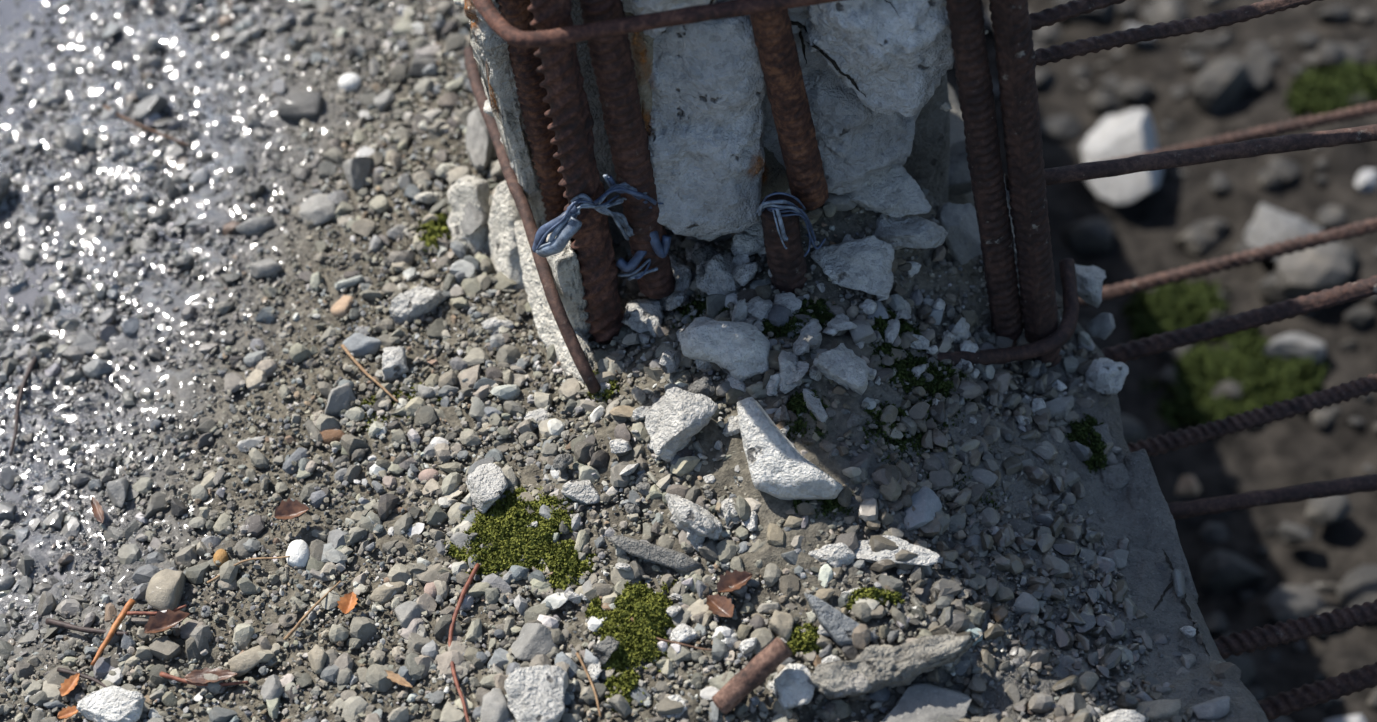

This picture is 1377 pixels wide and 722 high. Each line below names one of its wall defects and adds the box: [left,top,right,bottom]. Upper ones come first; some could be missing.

spalling [453,0,595,390]
spalling [621,0,791,241]
crack [791,21,866,97]
spalling [788,0,954,195]